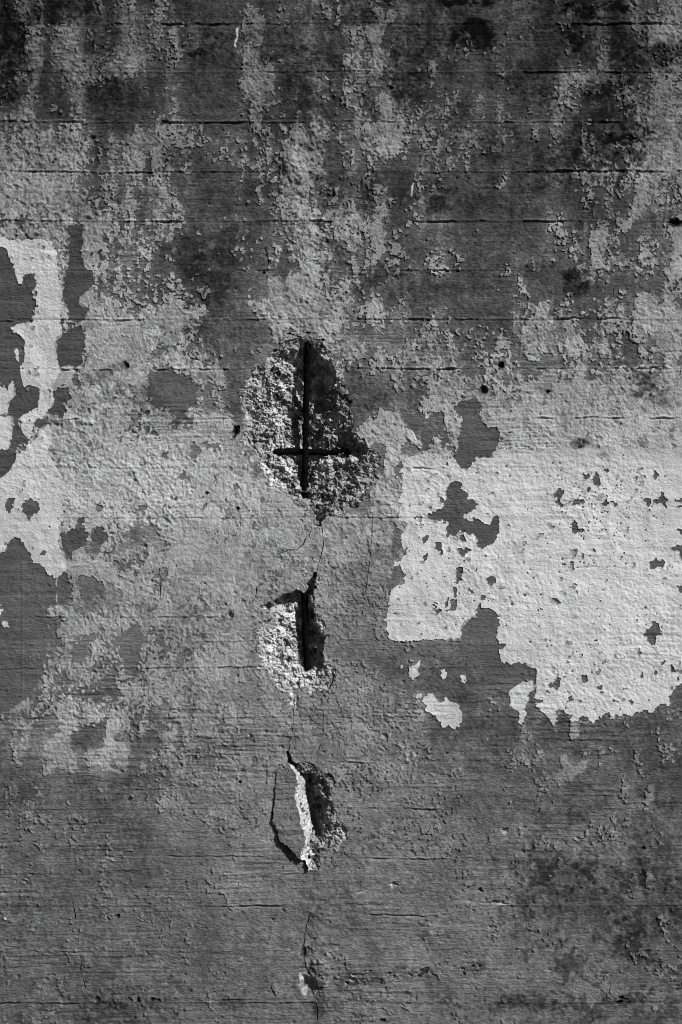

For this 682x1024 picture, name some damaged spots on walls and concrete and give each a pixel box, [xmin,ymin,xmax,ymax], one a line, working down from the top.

peeling [313,0,344,29]
peeling [421,58,437,88]
peeling [447,31,509,78]
peeling [220,214,263,272]
peeling [424,248,465,276]
peeling [400,659,421,680]
peeling [651,727,680,763]
peeling [634,750,655,810]
peeling [512,769,632,887]
peeling [23,834,232,1024]
peeling [288,940,438,1024]
peeling [626,903,681,1012]